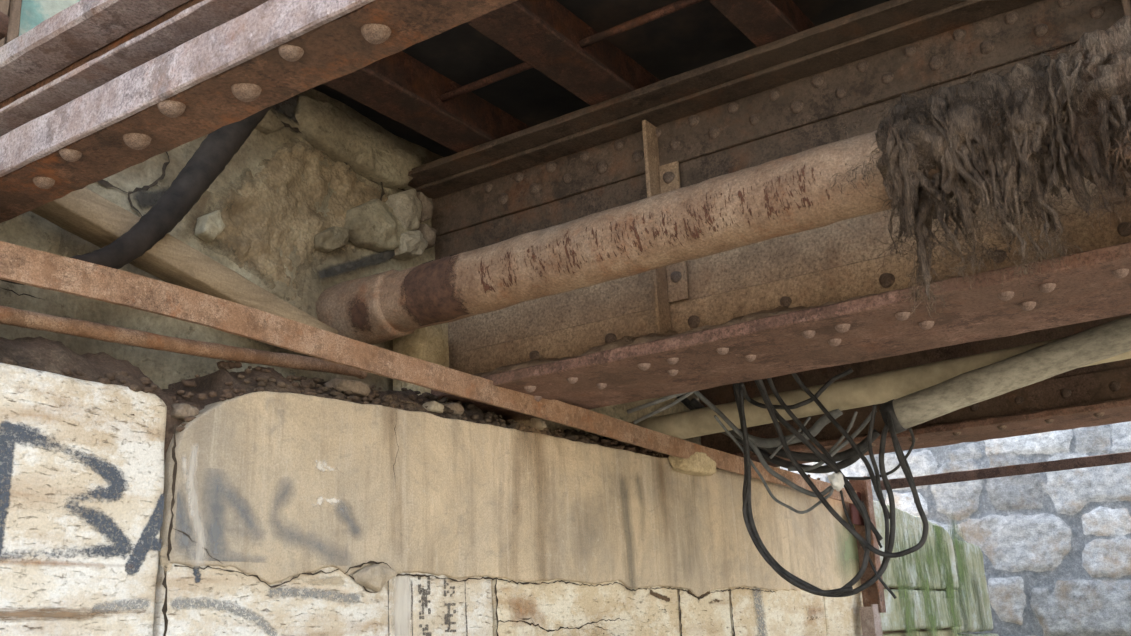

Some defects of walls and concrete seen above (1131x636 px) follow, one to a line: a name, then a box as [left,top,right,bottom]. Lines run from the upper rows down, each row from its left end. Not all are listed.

crack [97,152,170,216]
spalling [312,561,398,593]
crack [396,574,775,636]
water stain [898,521,983,636]